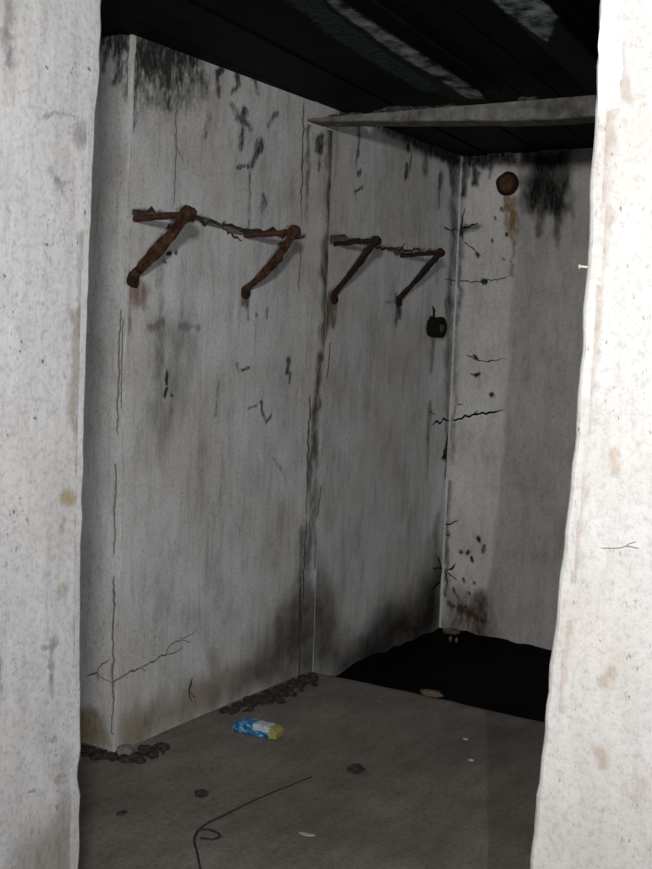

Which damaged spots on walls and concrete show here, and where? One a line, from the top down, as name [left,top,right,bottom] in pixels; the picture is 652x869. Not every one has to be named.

damp [100,34,205,124]
damp [237,107,250,150]
damp [237,139,264,178]
damp [308,124,333,219]
damp [321,233,329,343]
crack [116,309,124,433]
crack [430,404,502,425]
crack [111,463,119,548]
crack [87,577,196,734]